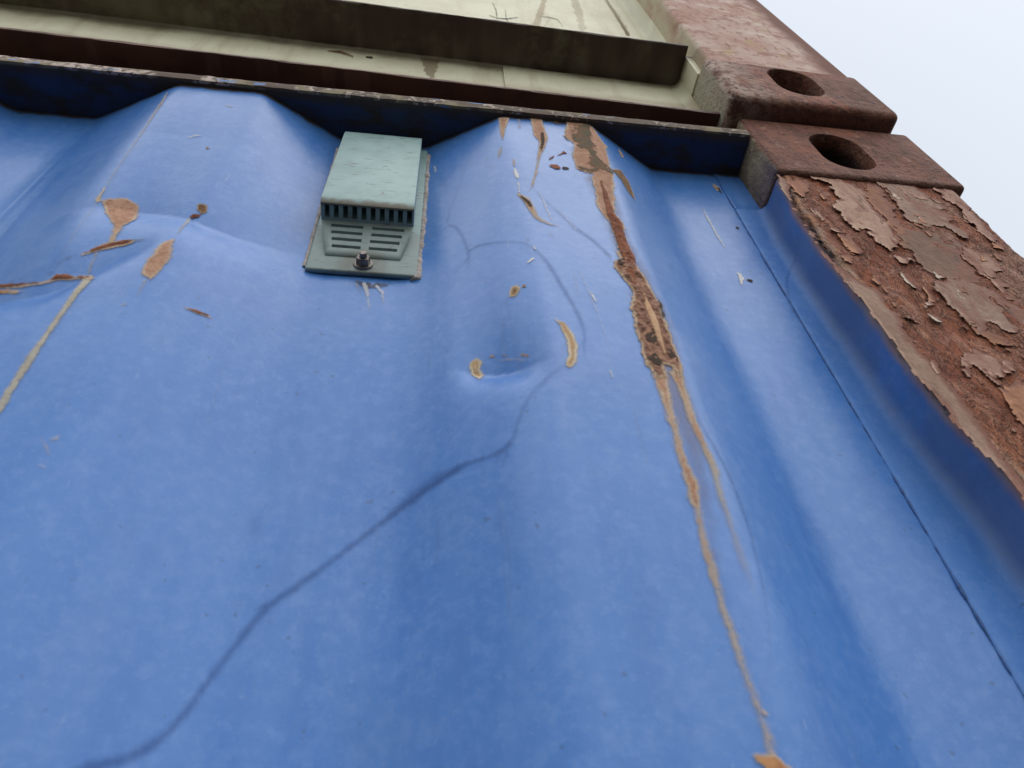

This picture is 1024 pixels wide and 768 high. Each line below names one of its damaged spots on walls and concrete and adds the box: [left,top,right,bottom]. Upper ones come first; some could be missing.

spalling [556,320,578,367]
corrosion [564,122,791,768]
peeling [776,174,1024,501]